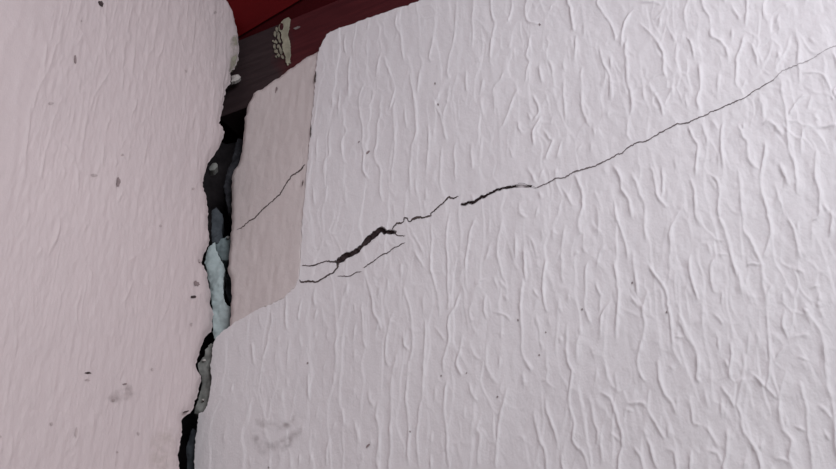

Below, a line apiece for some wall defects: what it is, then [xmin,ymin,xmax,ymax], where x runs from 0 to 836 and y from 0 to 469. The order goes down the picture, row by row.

crack [177,138,305,469]
crack [300,46,835,283]